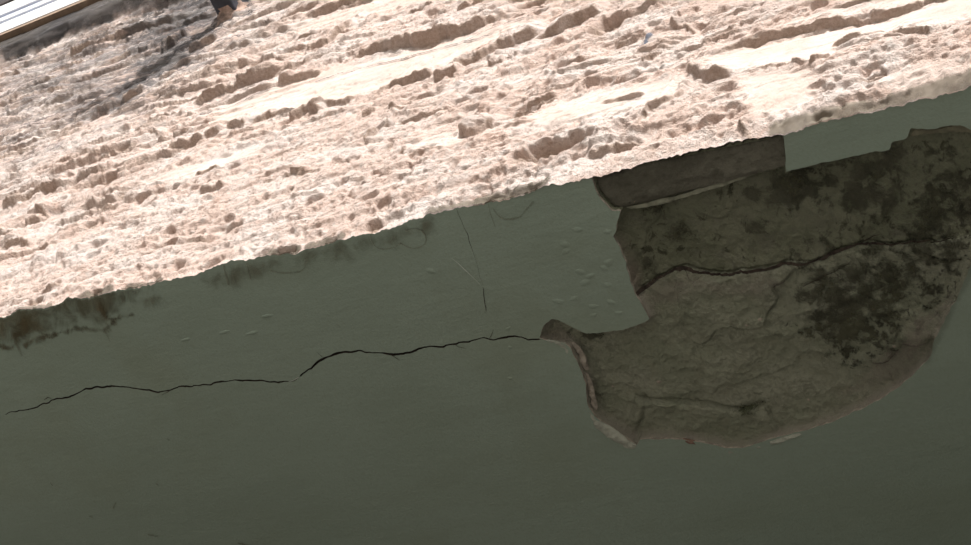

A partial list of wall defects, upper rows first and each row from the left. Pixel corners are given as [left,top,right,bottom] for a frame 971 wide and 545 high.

spalling [541,125,971,453]
crack [636,234,953,295]
crack [5,332,540,415]